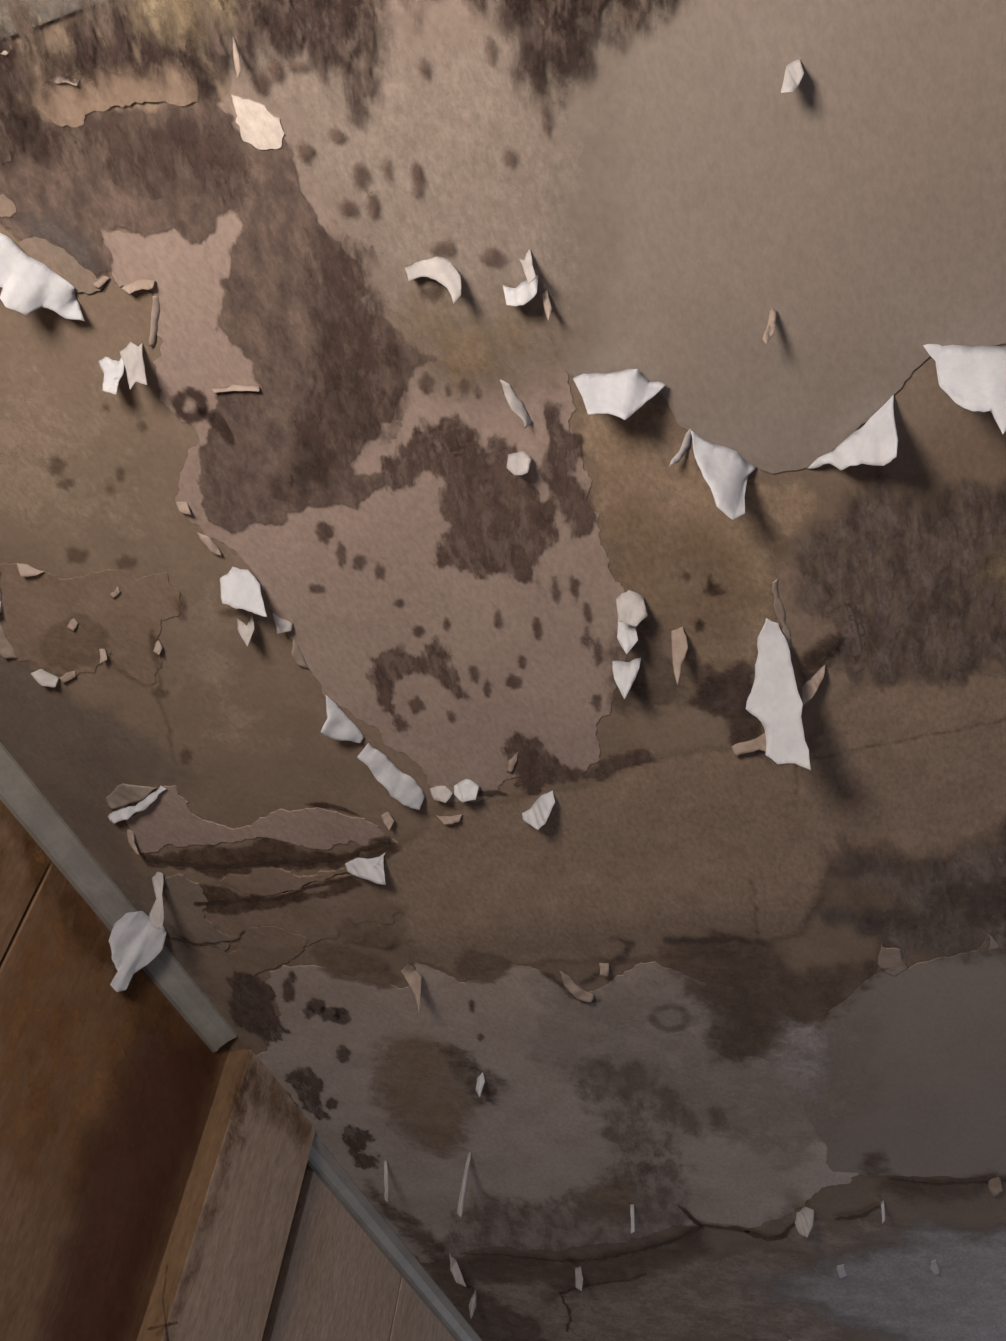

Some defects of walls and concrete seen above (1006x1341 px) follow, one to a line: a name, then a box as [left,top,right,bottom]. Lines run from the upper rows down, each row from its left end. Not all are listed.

water stain [0,0,1006,710]
peeling [91,0,1006,825]
water stain [371,619,490,732]
water stain [60,880,112,962]
water stain [822,827,1006,958]
water stain [225,1067,337,1156]
mould [227,972,350,1045]
mould [337,1045,350,1063]
mould [342,1125,380,1169]
water stain [378,1040,502,1155]
peeling [105,783,1006,1341]
crack [445,1206,795,1332]